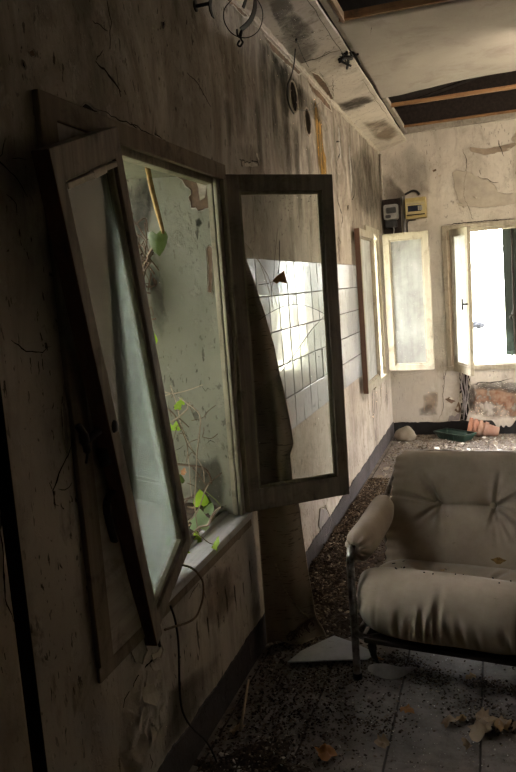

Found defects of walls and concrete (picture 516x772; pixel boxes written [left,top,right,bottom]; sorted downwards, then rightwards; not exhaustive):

crack [89,0,126,97]
water stain [271,0,311,59]
water stain [368,121,394,139]
crack [448,202,510,225]